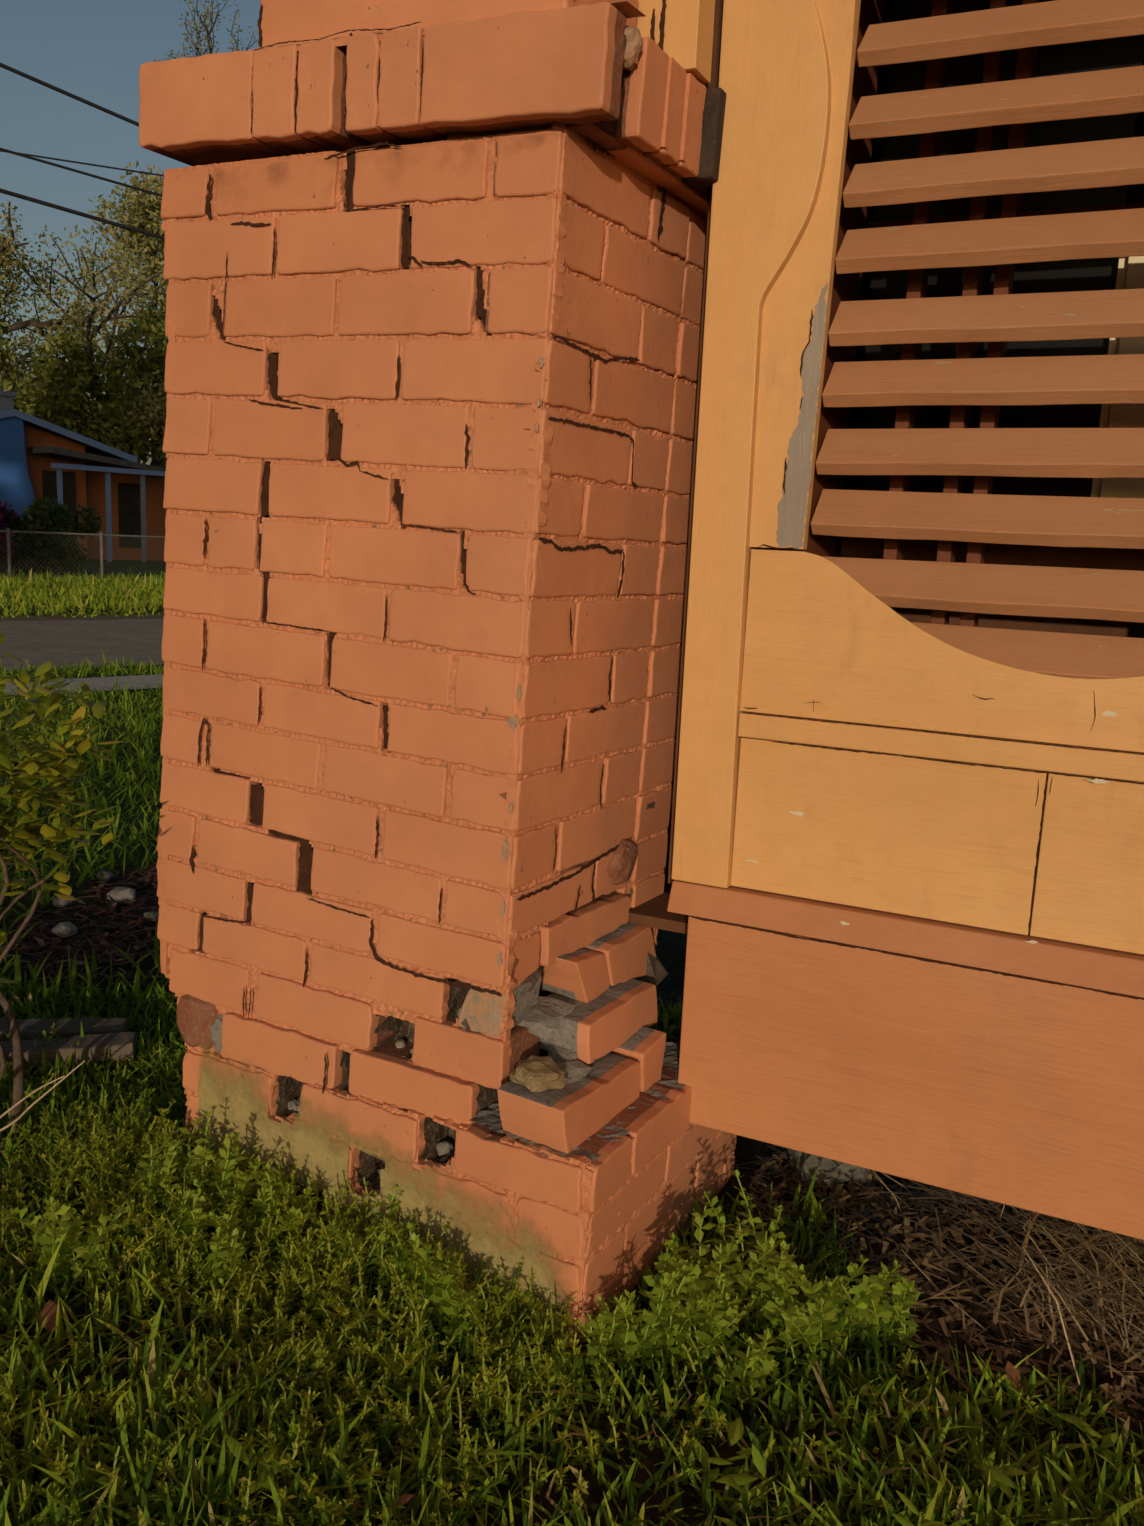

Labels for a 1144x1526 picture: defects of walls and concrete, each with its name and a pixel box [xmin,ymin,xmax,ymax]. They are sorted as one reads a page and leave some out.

crack [250,4,492,335]
crack [205,174,475,595]
crack [548,333,640,487]
peeling [757,283,828,549]
crack [258,462,389,749]
crack [192,717,501,997]
crack [517,826,632,914]
peeling [275,1075,306,1117]
peeling [357,1151,385,1190]
peeling [372,1014,415,1058]
peeling [422,1116,456,1162]
peeling [446,978,472,1023]